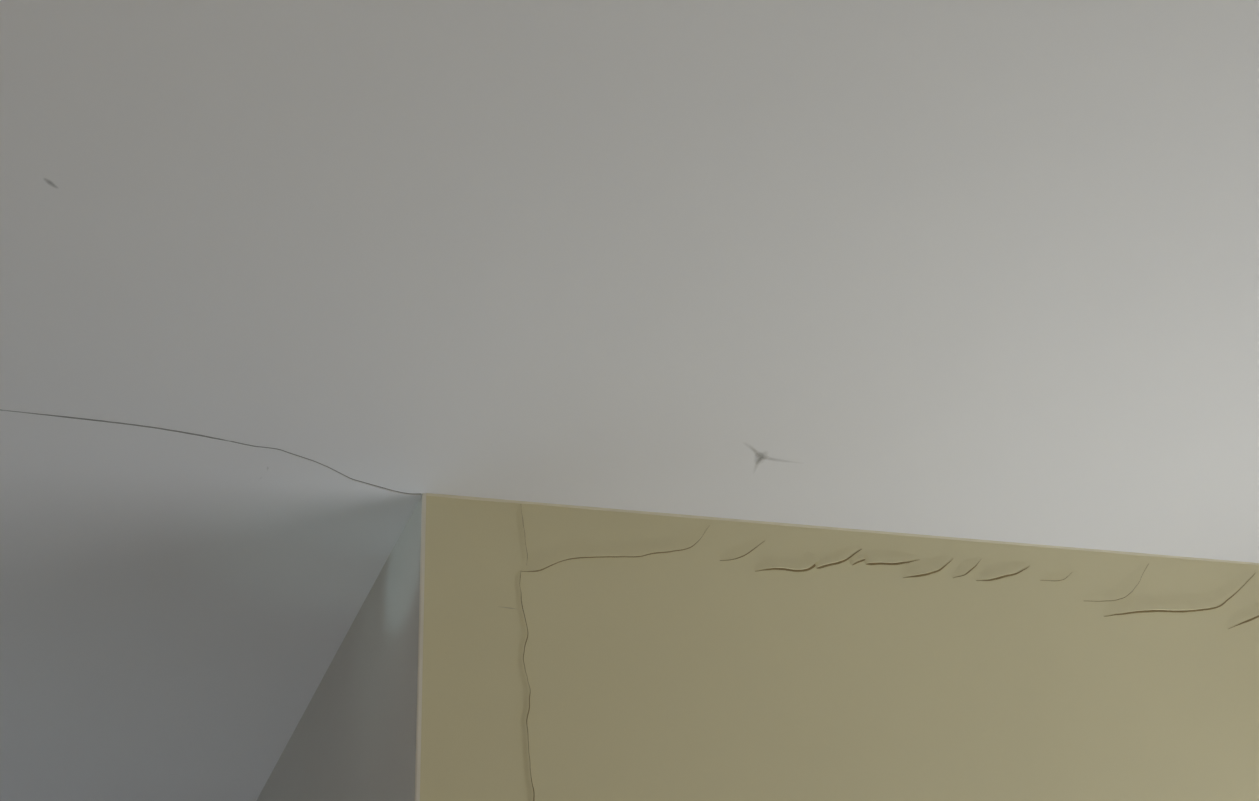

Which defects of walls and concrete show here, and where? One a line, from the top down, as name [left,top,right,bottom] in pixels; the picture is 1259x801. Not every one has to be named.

crack [0,409,421,566]
crack [514,504,710,801]